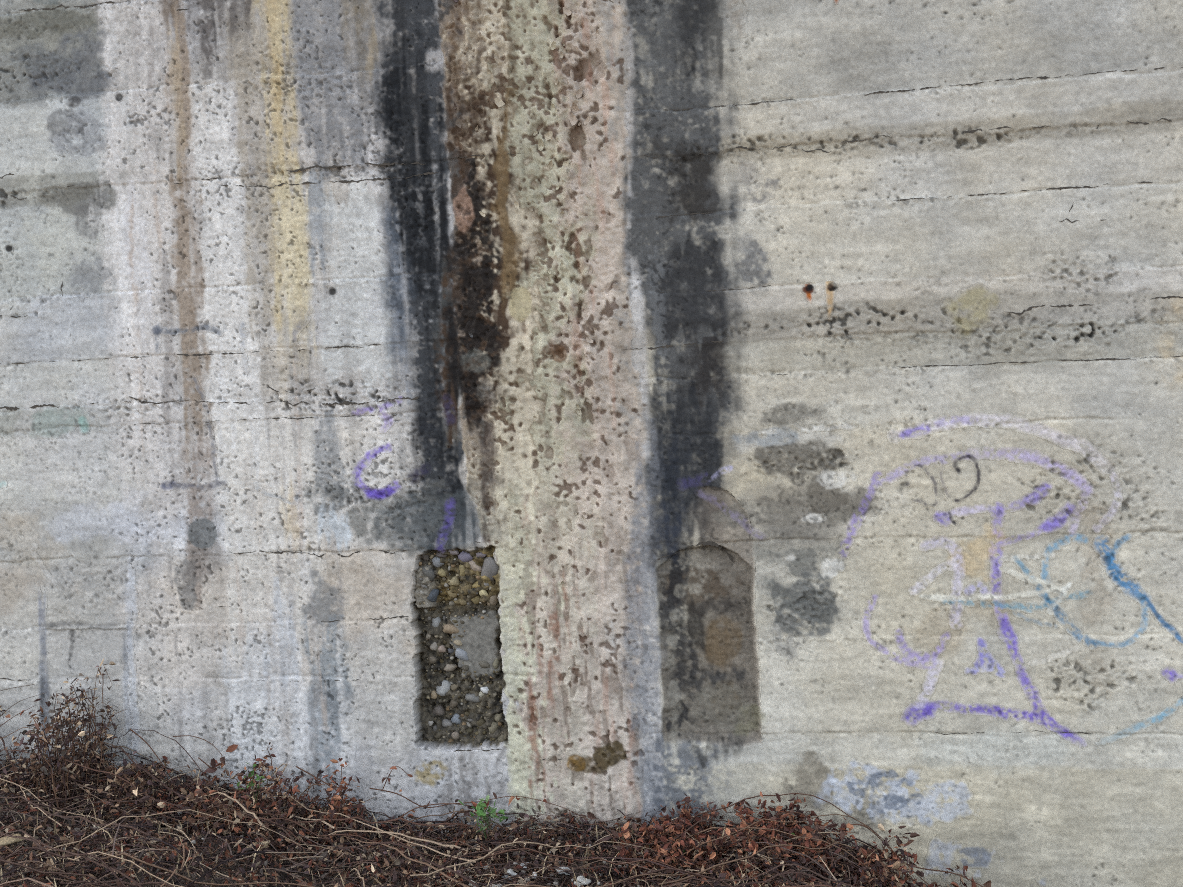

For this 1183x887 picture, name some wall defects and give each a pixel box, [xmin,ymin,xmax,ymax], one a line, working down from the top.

water stain [0,0,538,817]
spalling [410,545,509,752]
water stain [617,0,890,837]
rust [801,281,838,320]